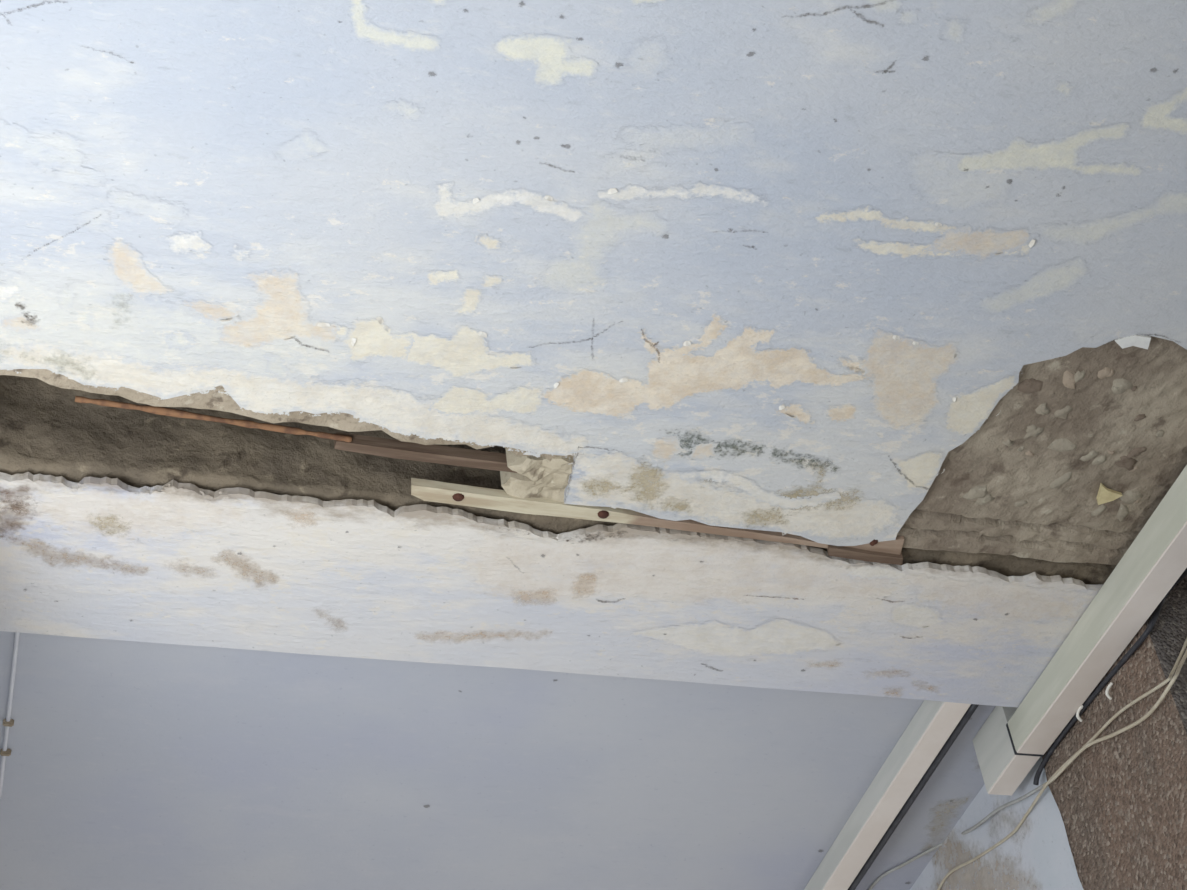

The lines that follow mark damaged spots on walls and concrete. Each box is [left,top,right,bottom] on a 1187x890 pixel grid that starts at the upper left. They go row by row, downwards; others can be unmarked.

peeling [347,0,441,54]
peeling [813,205,1036,261]
rust [75,396,352,442]
spalling [0,239,1187,607]
damp [679,433,837,499]
damp [0,488,27,531]